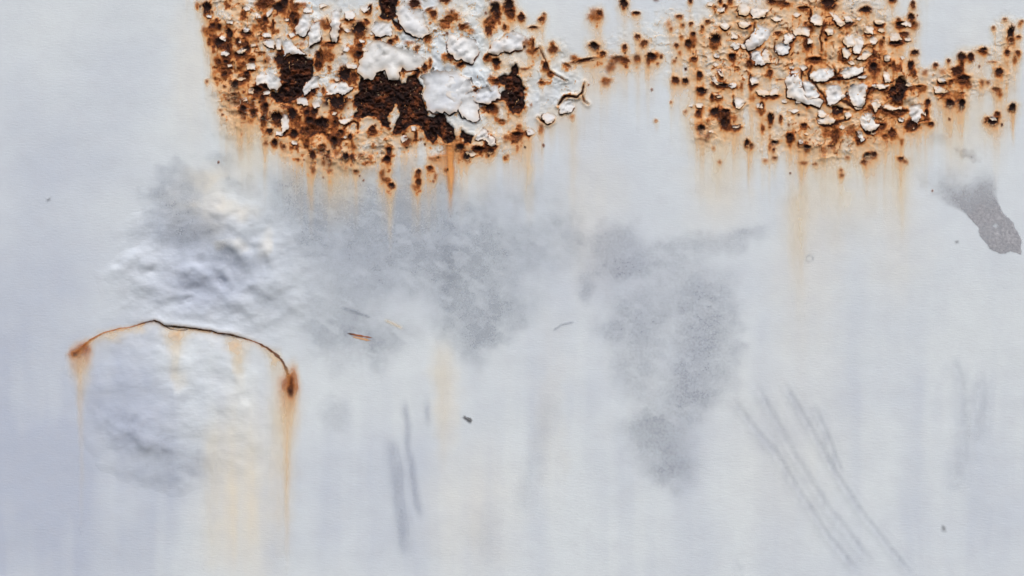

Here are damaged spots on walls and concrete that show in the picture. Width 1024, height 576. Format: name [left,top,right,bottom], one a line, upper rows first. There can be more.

rust [195,0,1024,199]
peeling [953,186,1021,254]
crack [70,320,298,412]